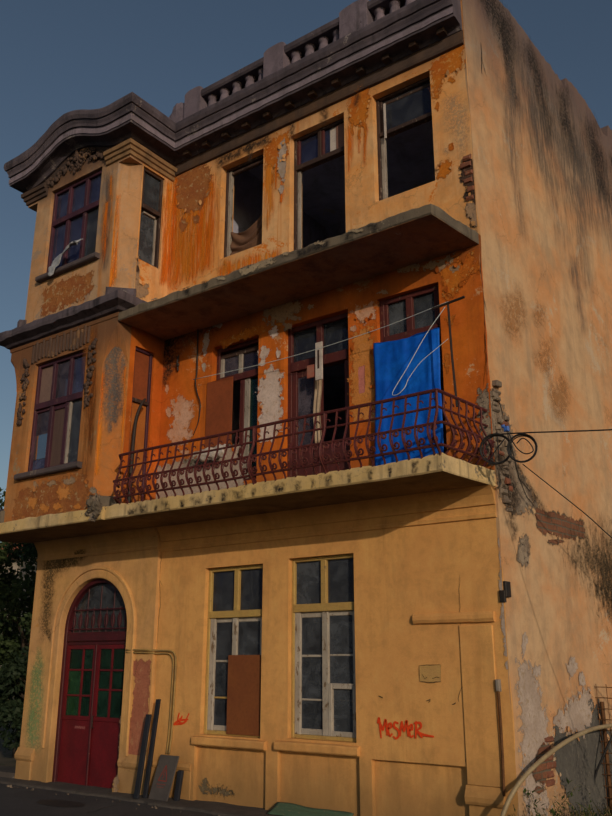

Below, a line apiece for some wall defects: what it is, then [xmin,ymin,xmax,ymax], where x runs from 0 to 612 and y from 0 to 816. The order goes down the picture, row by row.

peeling [428,43,466,111]
water stain [481,0,517,165]
water stain [528,49,612,224]
rust [161,177,219,285]
peeling [11,471,102,522]
water stain [101,347,125,431]
peeling [156,385,246,499]
peeling [201,300,314,445]
water stain [496,447,538,534]
spalling [475,380,586,546]
water stain [571,525,612,617]
peeling [498,533,601,816]